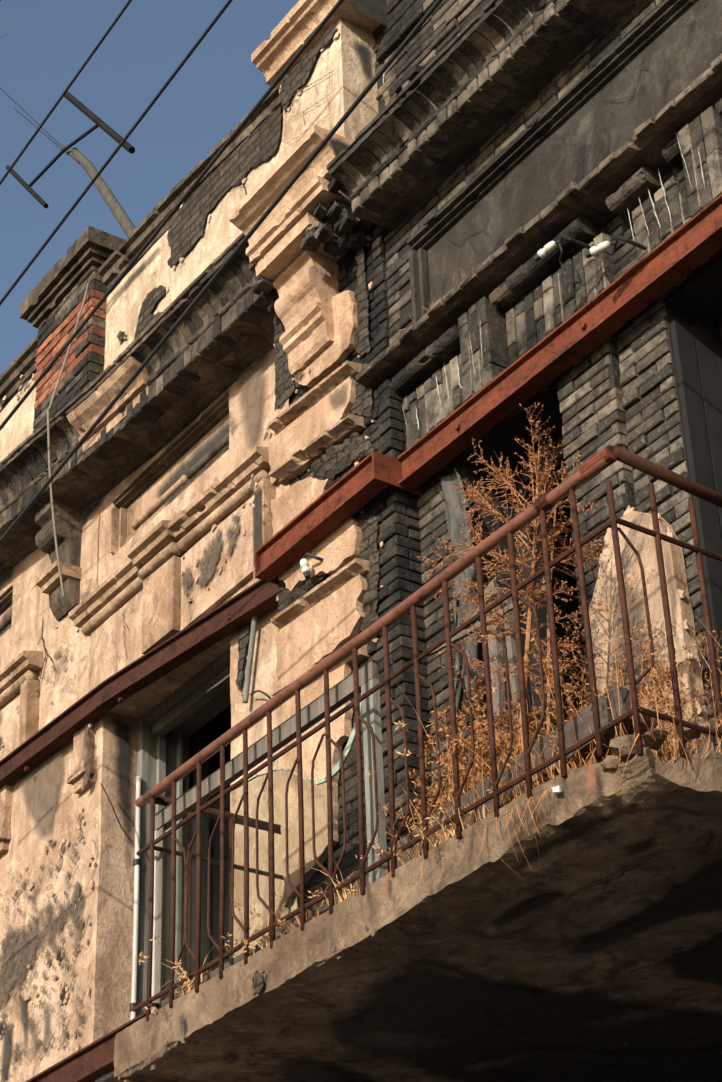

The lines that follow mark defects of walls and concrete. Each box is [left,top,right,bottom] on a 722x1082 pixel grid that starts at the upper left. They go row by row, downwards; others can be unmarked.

flaking render [167,21,340,270]
flaking render [117,285,169,343]
flaking render [248,261,311,411]
spalling [300,177,375,423]
flaking render [307,431,374,480]
flaking render [276,574,324,610]
flaking render [356,510,384,643]
water stain [1,998,48,1082]